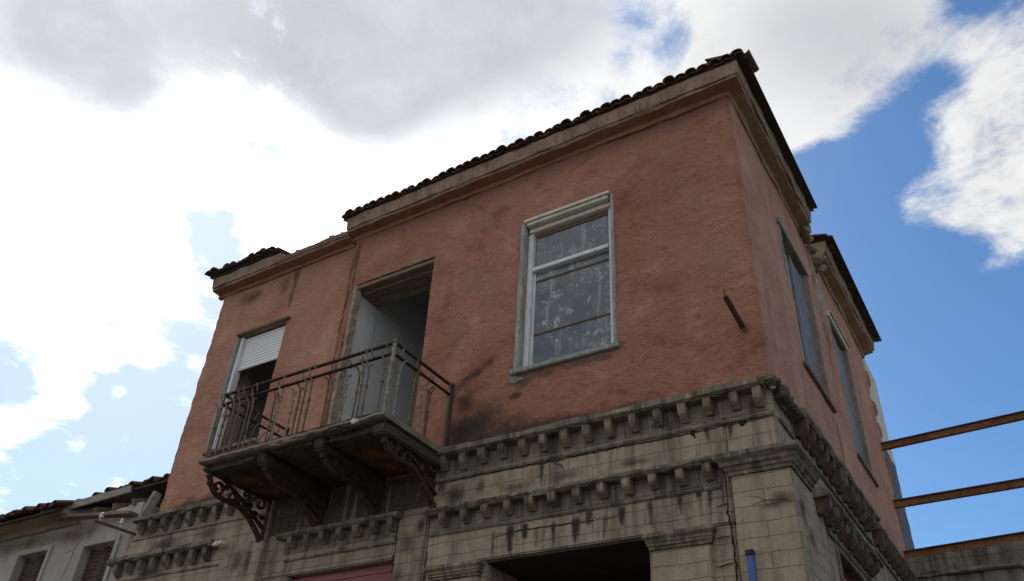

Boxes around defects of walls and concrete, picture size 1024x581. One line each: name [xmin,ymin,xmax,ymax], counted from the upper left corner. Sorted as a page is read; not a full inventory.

damp [492,524,537,553]
damp [572,512,605,541]
crack [716,472,794,581]